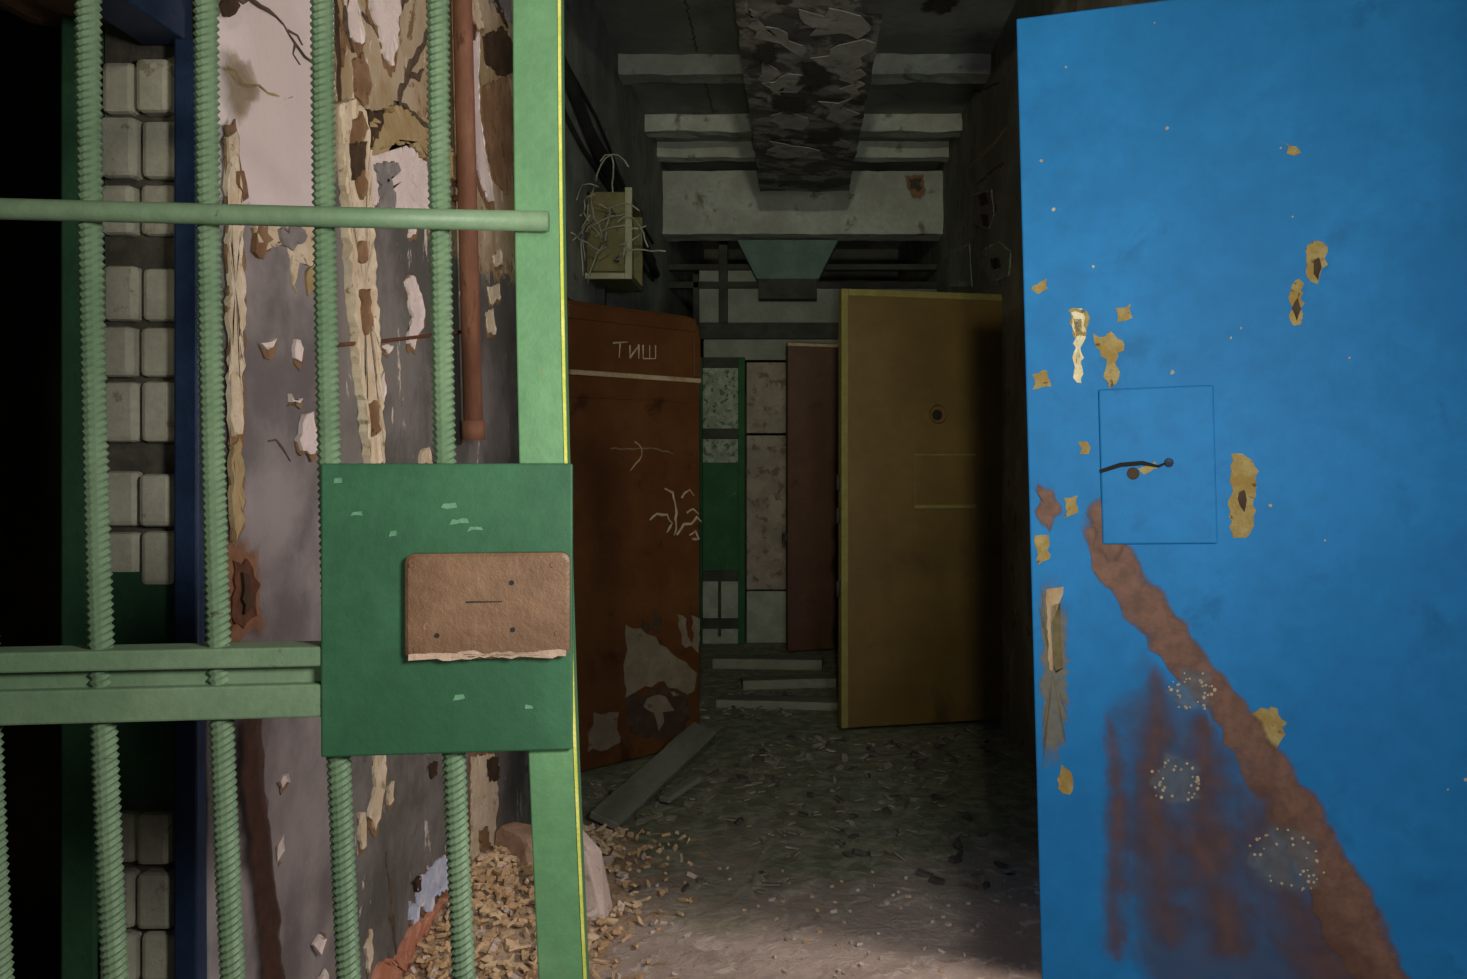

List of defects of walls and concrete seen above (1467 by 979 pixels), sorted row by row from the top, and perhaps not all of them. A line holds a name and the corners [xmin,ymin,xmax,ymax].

crack [238,0,347,101]
peeling [333,0,430,209]
spalling [472,0,514,210]
peeling [224,225,318,555]
peeling [340,228,426,463]
spalling [1068,304,1133,388]
spalling [1288,241,1328,326]
rust [1036,486,1061,531]
spalling [1228,453,1259,538]
rust [226,543,264,642]
rust [1085,501,1408,979]
spalling [363,852,449,979]